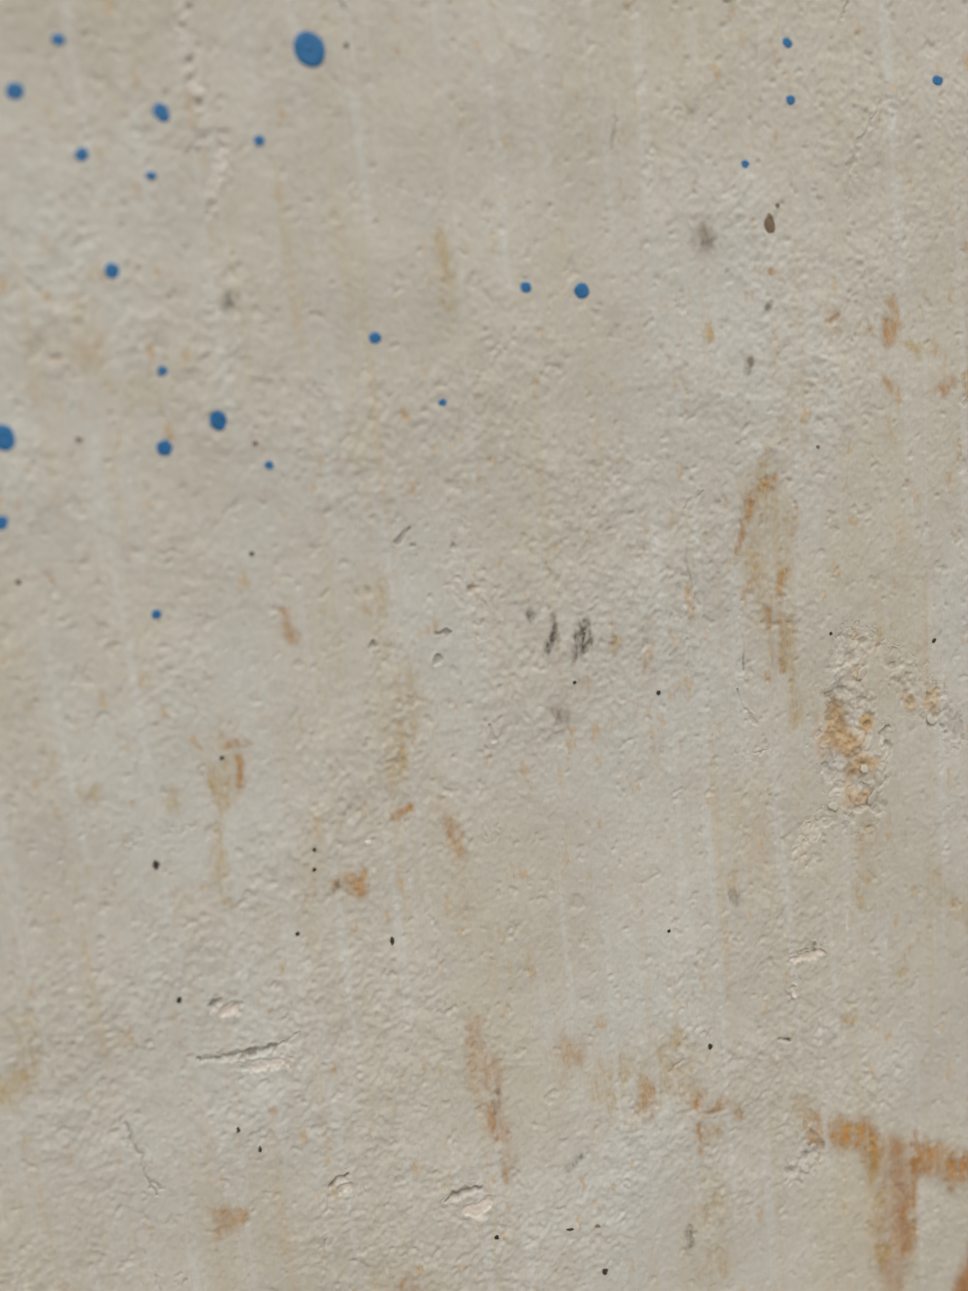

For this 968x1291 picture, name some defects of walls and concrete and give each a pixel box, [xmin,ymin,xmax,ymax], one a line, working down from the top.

spalling [788,616,968,875]
corrosion [831,1121,879,1176]
corrosion [957,1268,968,1291]